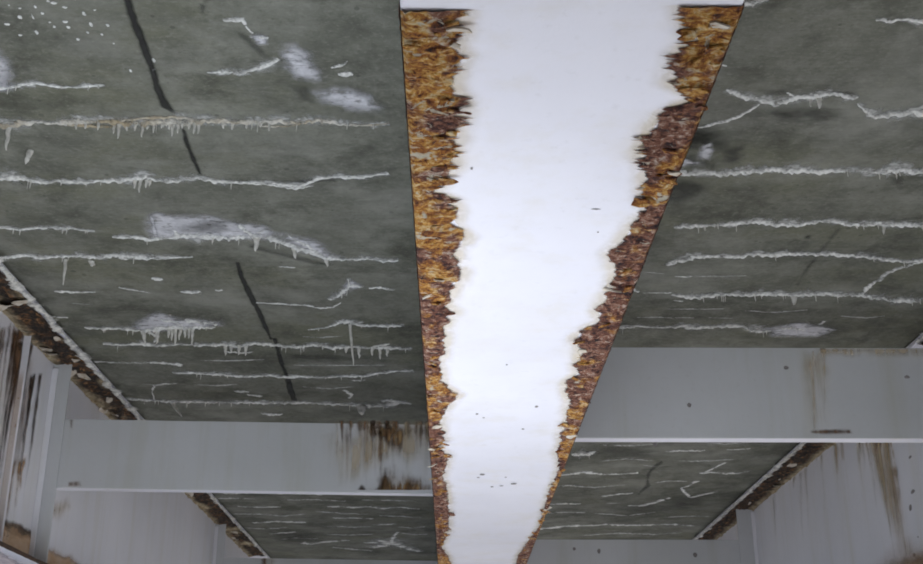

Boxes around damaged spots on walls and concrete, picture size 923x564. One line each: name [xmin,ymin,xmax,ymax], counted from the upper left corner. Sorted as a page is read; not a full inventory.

crack [0,18,390,192]
water stain [689,131,711,148]
rust [0,257,143,457]
crack [0,213,415,417]
rust [340,0,473,564]
rust [516,2,745,564]
rust [8,460,25,501]
rust [184,492,268,564]
rust [693,430,850,540]